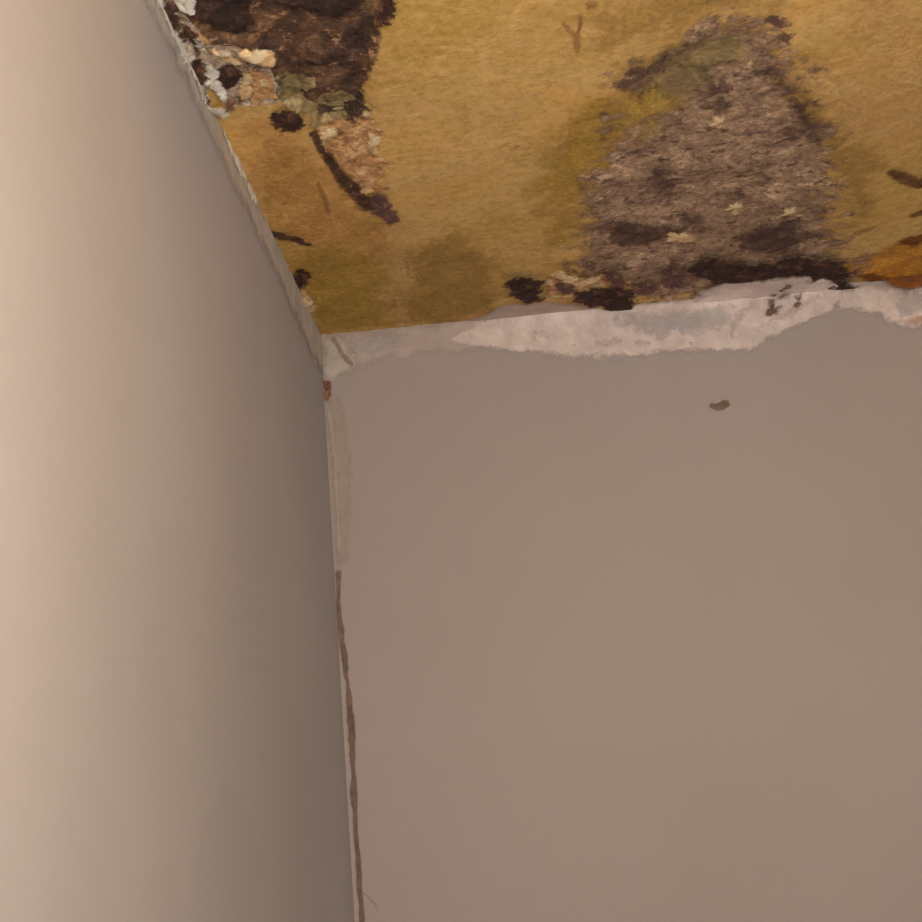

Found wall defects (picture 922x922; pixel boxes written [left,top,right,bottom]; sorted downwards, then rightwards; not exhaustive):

spalling [147,0,396,370]
peeling [341,270,922,367]
damp [534,14,874,305]
rust [849,235,922,289]
crack [336,571,378,922]